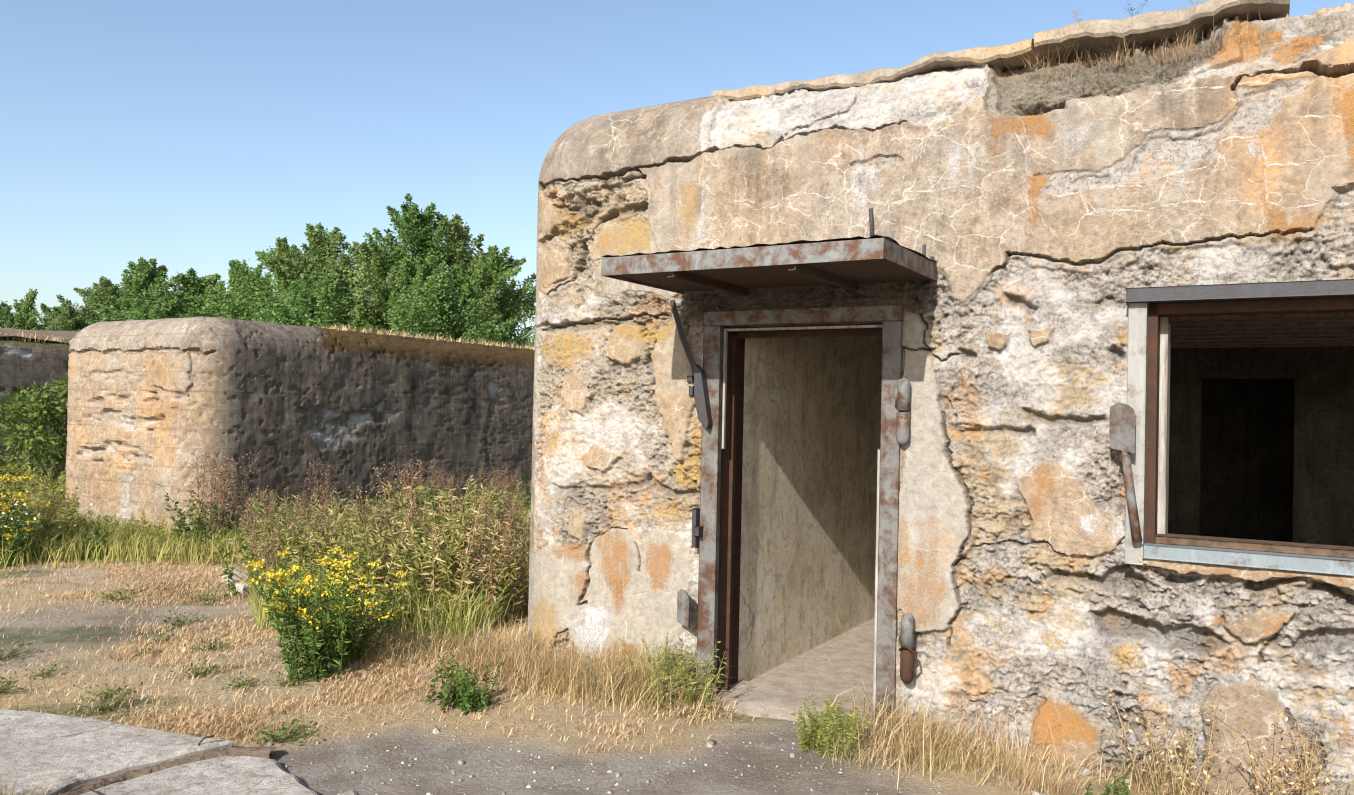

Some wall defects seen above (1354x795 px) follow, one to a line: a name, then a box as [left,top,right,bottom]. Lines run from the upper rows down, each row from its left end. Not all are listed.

crack [719,101,1320,273]
spalling [698,2,1354,195]
spalling [528,173,1354,795]
crack [919,411,1066,650]